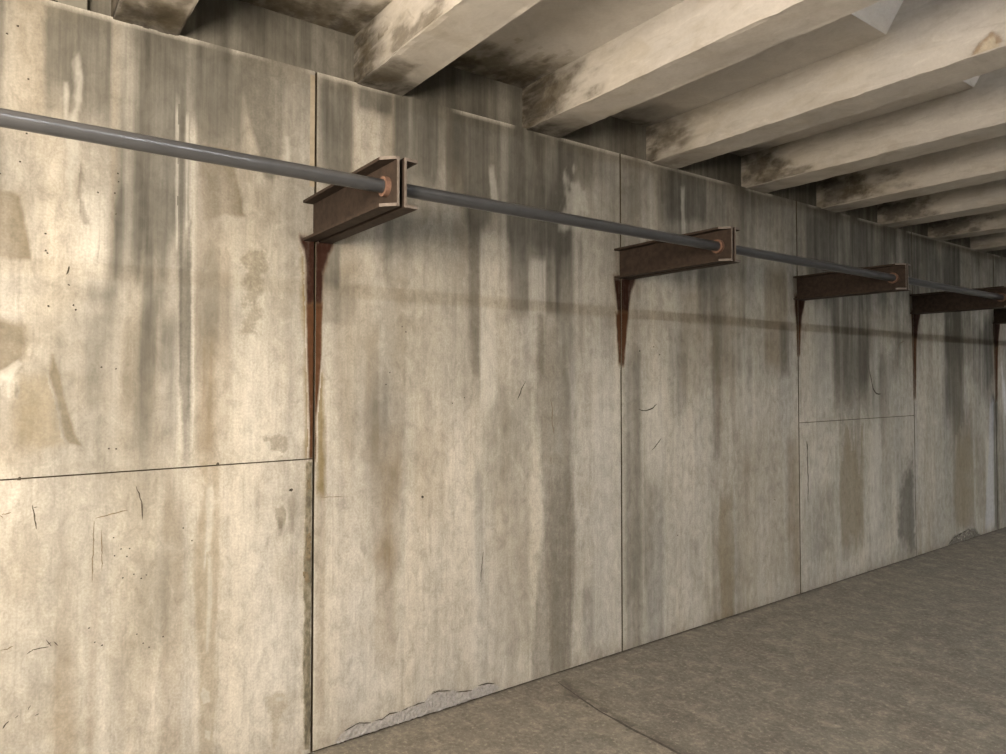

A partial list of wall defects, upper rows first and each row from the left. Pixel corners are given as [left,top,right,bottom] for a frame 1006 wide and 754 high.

water stain [62,48,86,123]
water stain [111,0,196,36]
water stain [239,0,451,87]
water stain [448,38,607,129]
flaking render [969,29,1004,56]
rust [297,230,335,503]
rust [612,271,637,370]
rust [794,291,807,360]
rust [910,305,922,402]
water stain [945,311,1006,540]
spalling [334,681,501,744]
crack [557,678,699,754]